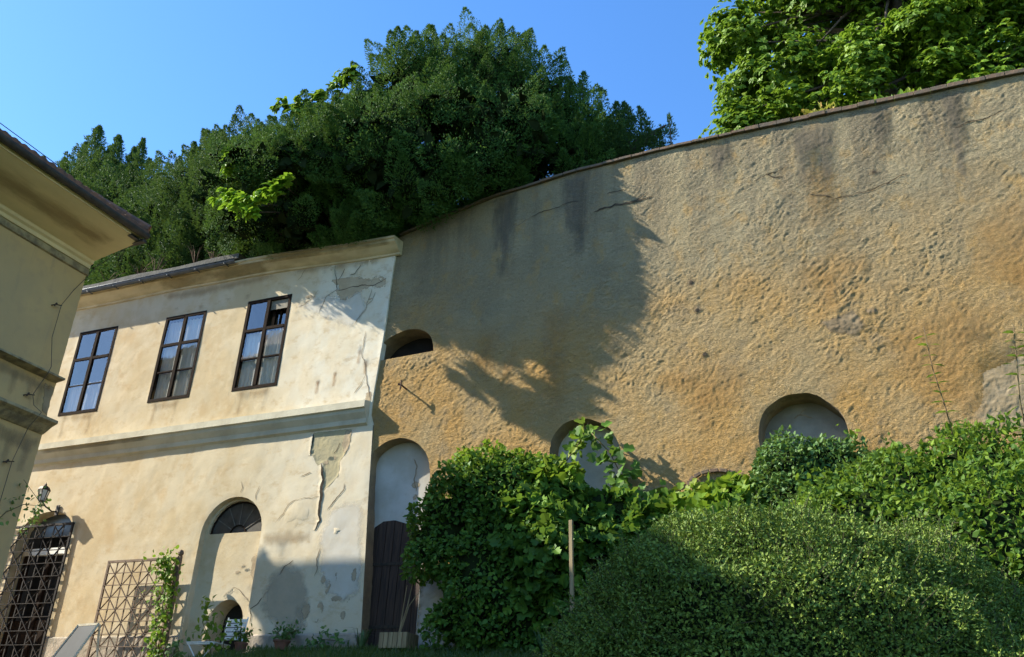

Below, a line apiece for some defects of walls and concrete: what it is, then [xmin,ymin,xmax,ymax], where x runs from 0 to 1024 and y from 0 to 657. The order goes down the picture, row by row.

crack [509,189,651,229]
crack [810,173,908,200]
spalling [332,276,386,300]
crack [298,265,383,397]
spalling [980,353,1024,425]
spalling [308,429,352,490]
crack [205,464,345,624]